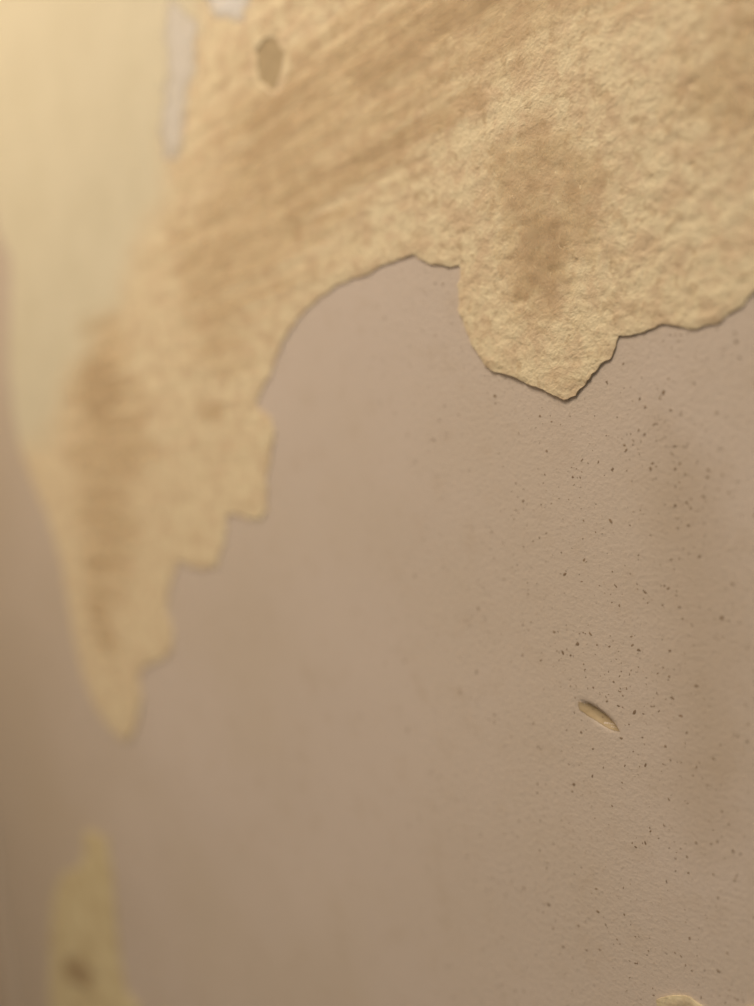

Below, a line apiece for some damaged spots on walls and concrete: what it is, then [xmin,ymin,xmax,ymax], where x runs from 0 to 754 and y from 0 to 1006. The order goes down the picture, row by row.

peeling [0,0,754,741]